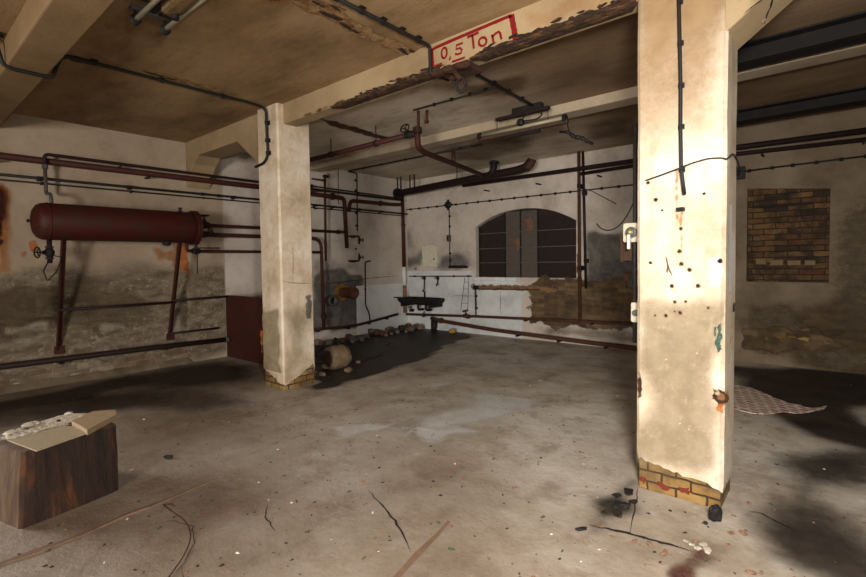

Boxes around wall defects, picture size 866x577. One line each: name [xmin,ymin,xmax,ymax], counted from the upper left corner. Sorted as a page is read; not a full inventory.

spalling [290,0,417,55]
spalling [469,0,638,62]
spalling [305,64,444,116]
corrosion [0,185,9,270]
corrosion [155,244,189,278]
peeling [477,254,638,330]
damp [0,267,253,427]
crack [368,490,410,550]